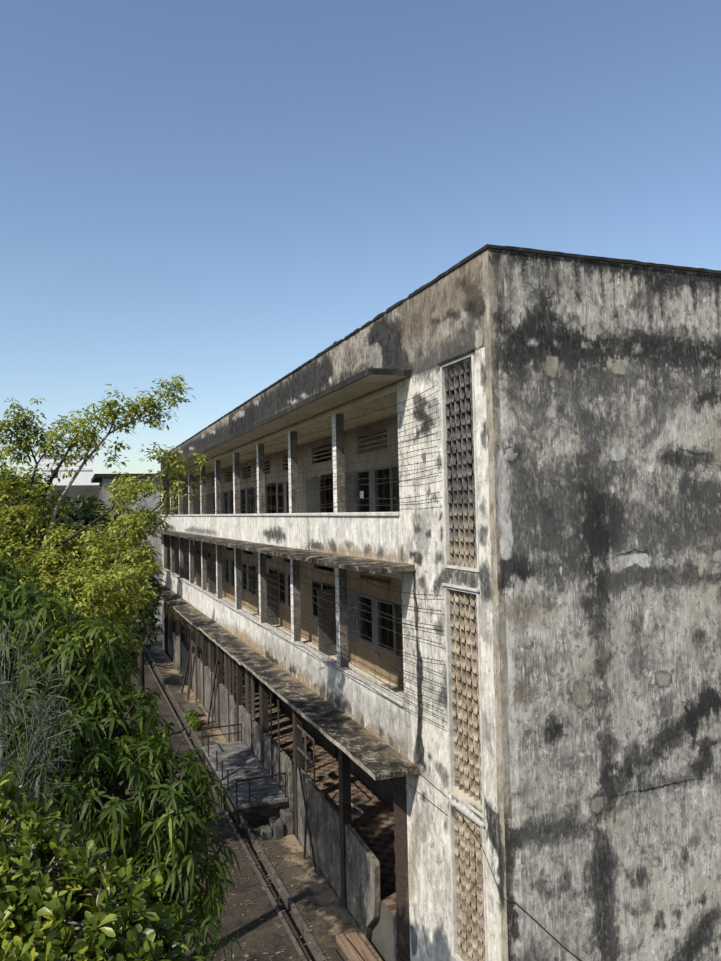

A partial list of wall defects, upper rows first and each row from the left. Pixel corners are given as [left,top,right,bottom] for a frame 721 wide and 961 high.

damp [161,251,721,829]
damp [469,688,721,961]
crack [611,778,705,798]